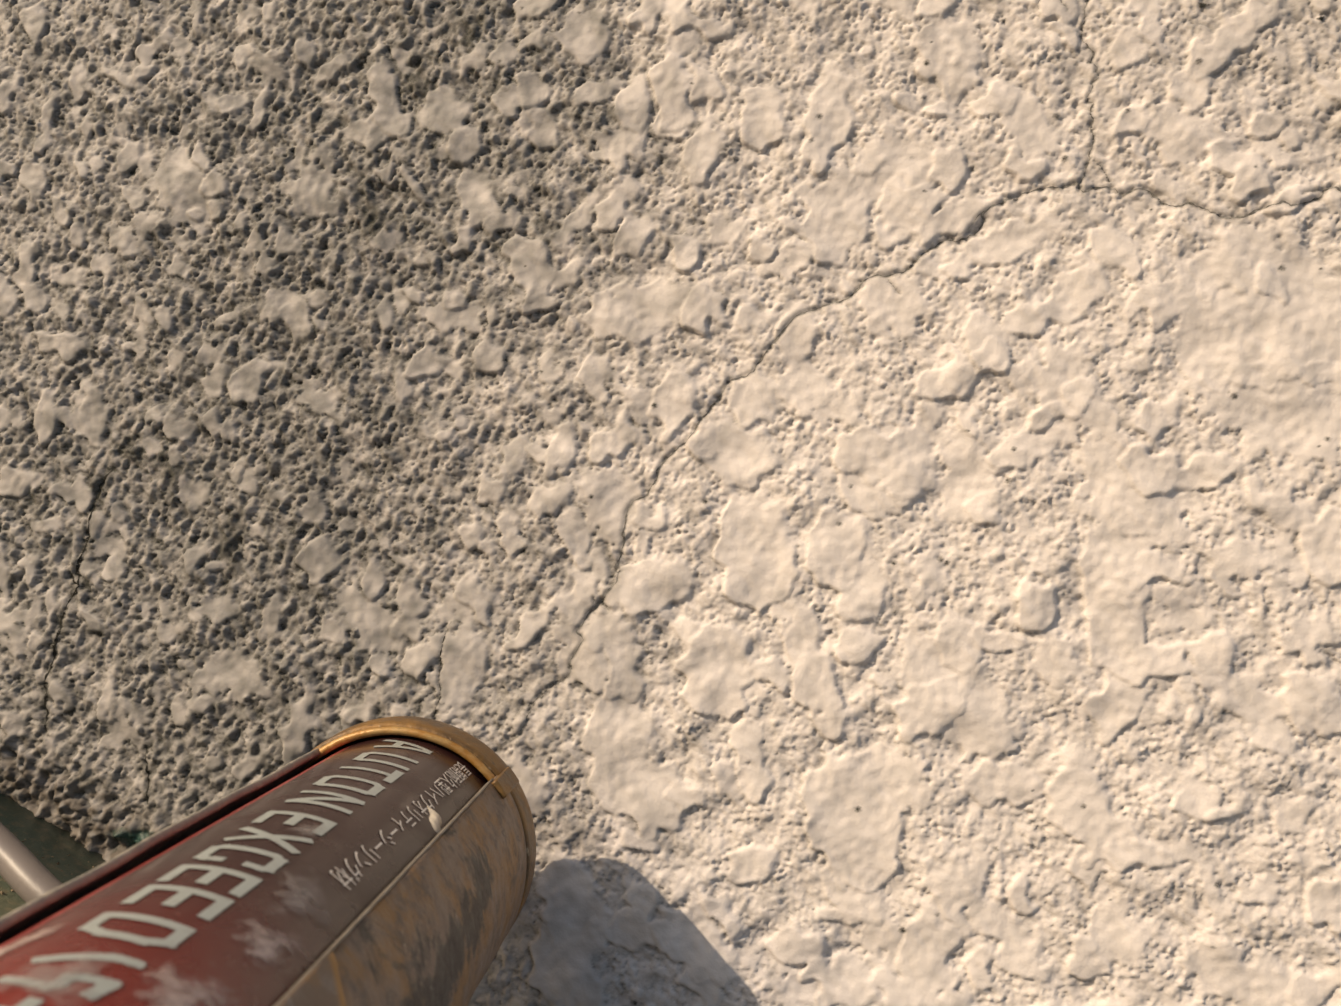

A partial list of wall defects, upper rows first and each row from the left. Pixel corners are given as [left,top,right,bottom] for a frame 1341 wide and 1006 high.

crack [44,470,112,731]
crack [497,0,1341,750]